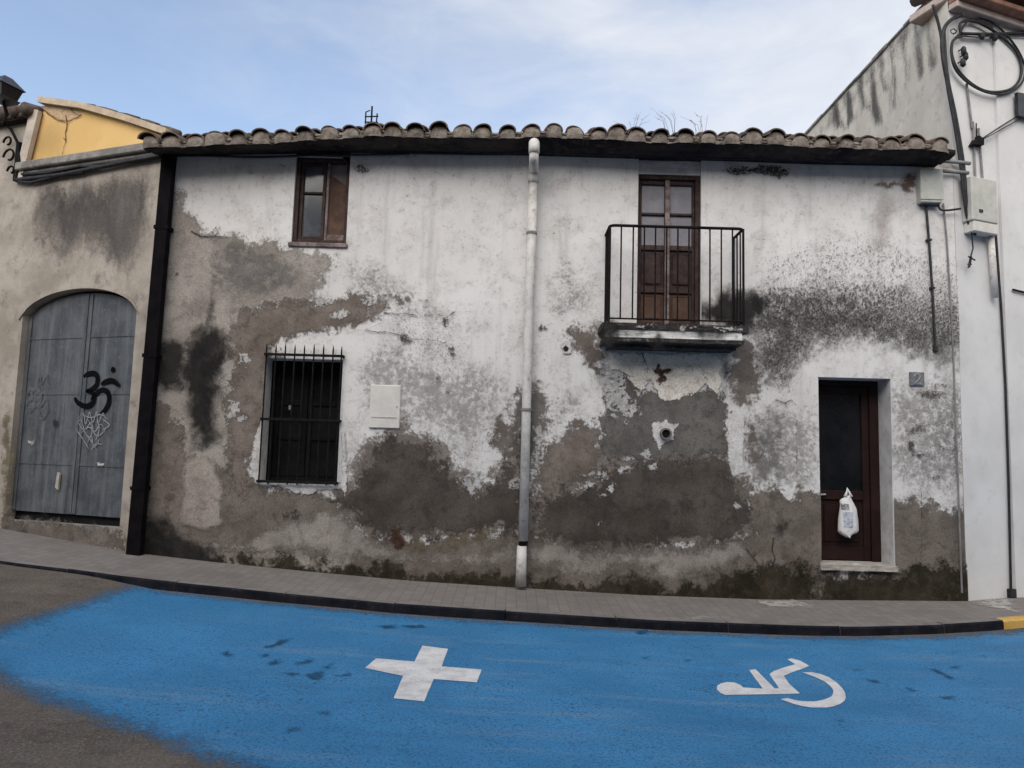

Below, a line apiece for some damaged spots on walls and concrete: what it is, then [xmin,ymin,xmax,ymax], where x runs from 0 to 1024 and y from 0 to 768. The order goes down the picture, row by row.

leakage [832,45,896,128]
crack [43,109,82,153]
leakage [35,178,147,264]
leakage [696,232,960,388]
leakage [158,304,227,450]
peeling [602,350,722,427]
corrosion [653,364,672,385]
peeling [249,380,348,496]
leakage [144,380,755,581]
peeling [652,419,679,450]
peeling [725,411,818,484]
peeling [892,383,962,488]